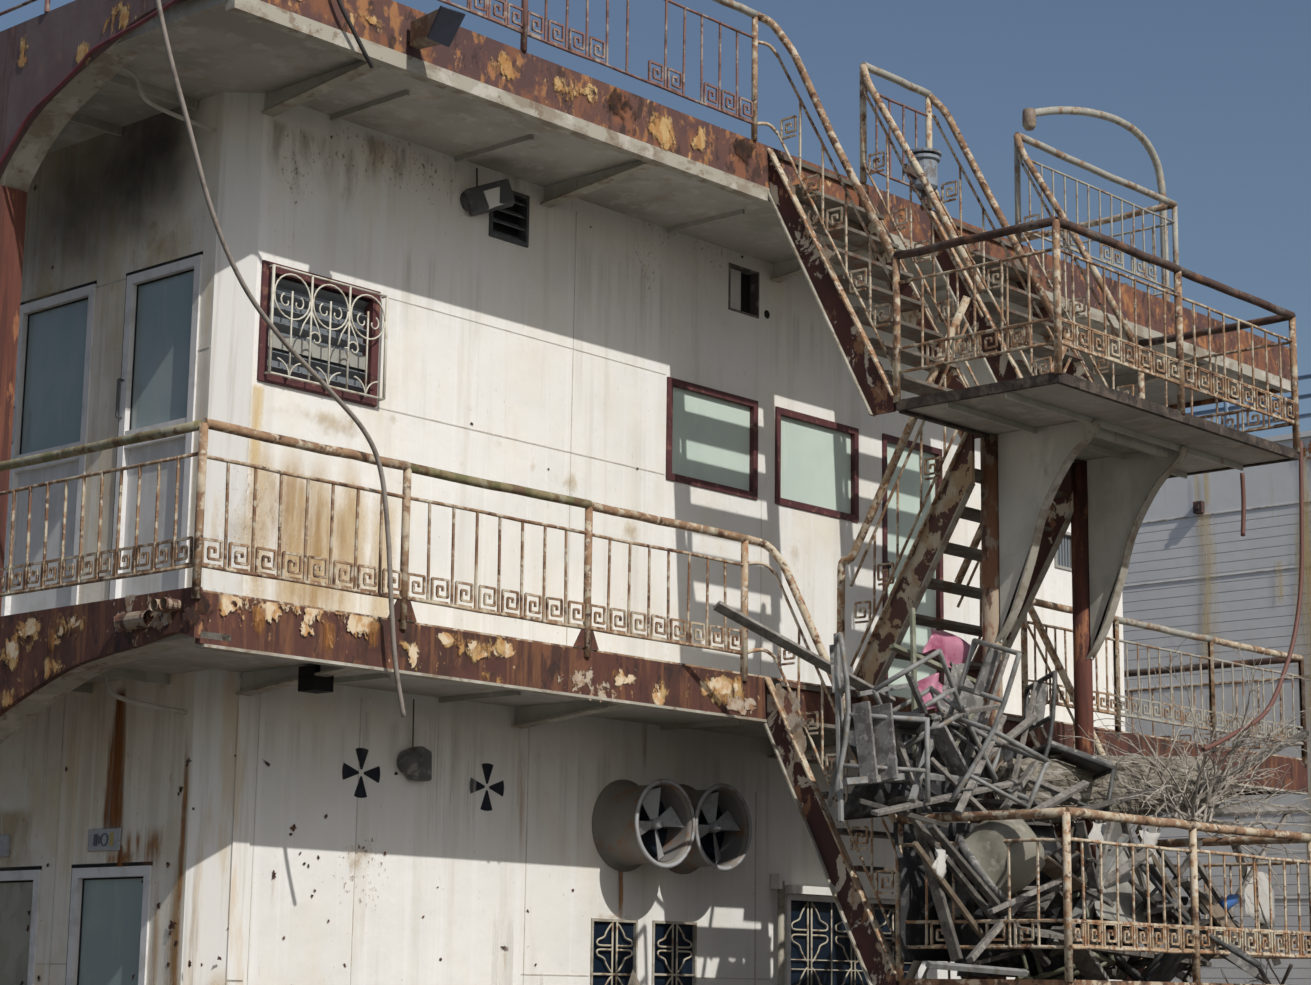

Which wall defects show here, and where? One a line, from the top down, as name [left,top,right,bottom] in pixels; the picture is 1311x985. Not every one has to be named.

peeling [103,1,136,33]
peeling [76,41,90,65]
peeling [491,51,515,80]
peeling [553,77,708,163]
peeling [730,138,756,164]
corrosion [376,520,387,580]
peeling [0,614,86,679]
peeling [113,593,382,649]
peeling [400,642,419,670]
peeling [435,632,516,683]
corrosion [104,692,158,867]
corrosion [173,768,187,985]